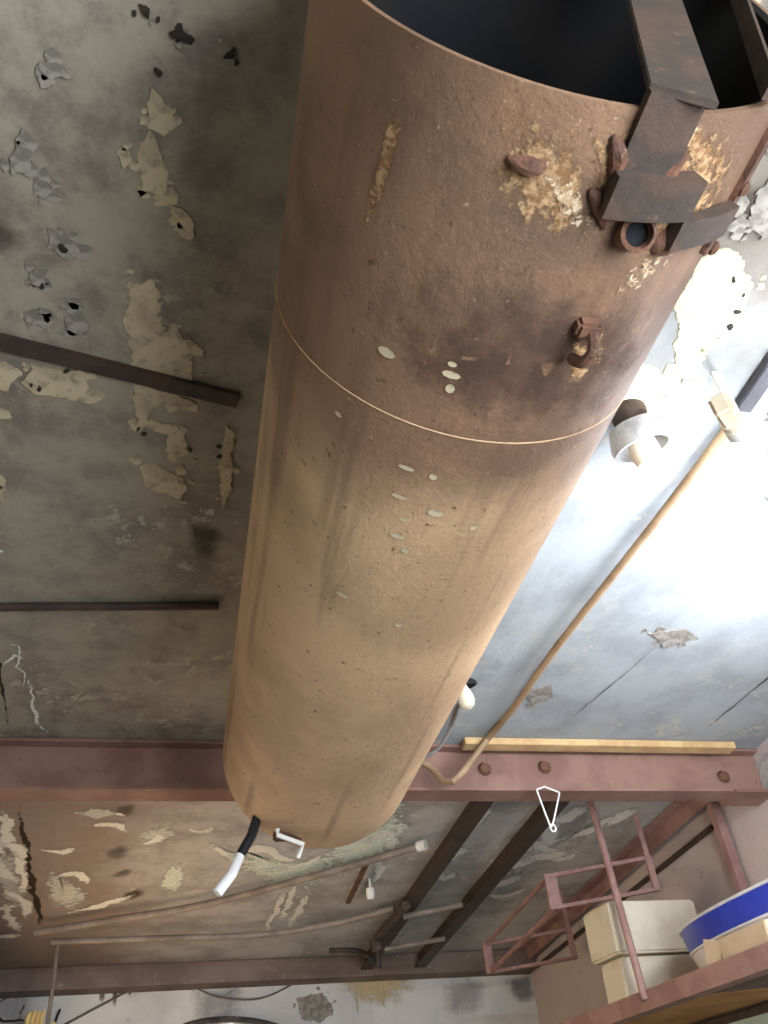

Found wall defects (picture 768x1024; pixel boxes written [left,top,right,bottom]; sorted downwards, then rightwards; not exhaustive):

peeling [116,89,194,241]
peeling [123,267,204,380]
peeling [624,179,768,415]
peeling [0,361,106,404]
peeling [127,384,198,504]
peeling [216,424,240,508]
crack [0,662,9,723]
peeling [641,626,699,649]
crack [18,812,44,924]
peeling [293,986,336,1023]